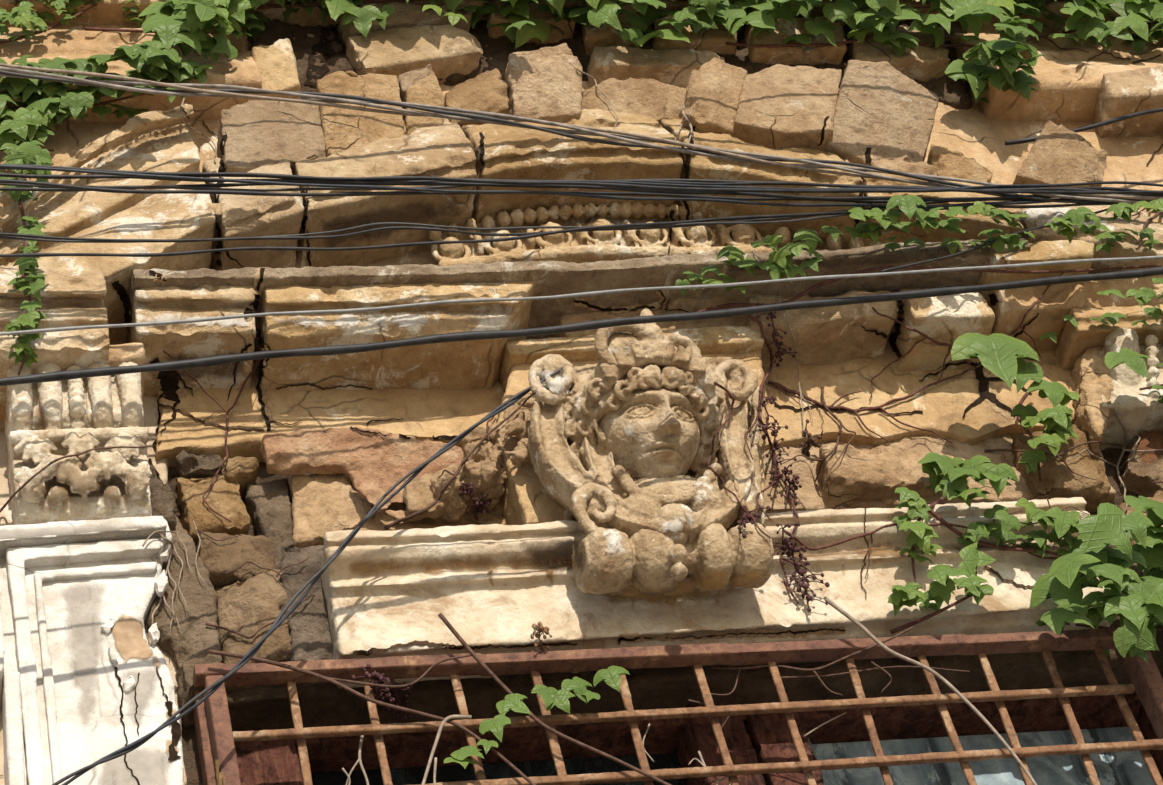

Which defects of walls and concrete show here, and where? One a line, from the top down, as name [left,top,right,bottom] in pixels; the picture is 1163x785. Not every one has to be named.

crack [476,132,486,171]
crack [1146,144,1163,166]
crack [667,126,696,253]
crack [149,109,457,446]
crack [861,300,905,359]
crack [989,293,1002,306]
crack [1014,313,1039,338]
crack [919,361,1032,419]
crack [774,404,923,441]
peeling [154,542,170,598]
spalling [101,614,160,694]
crack [115,666,181,785]